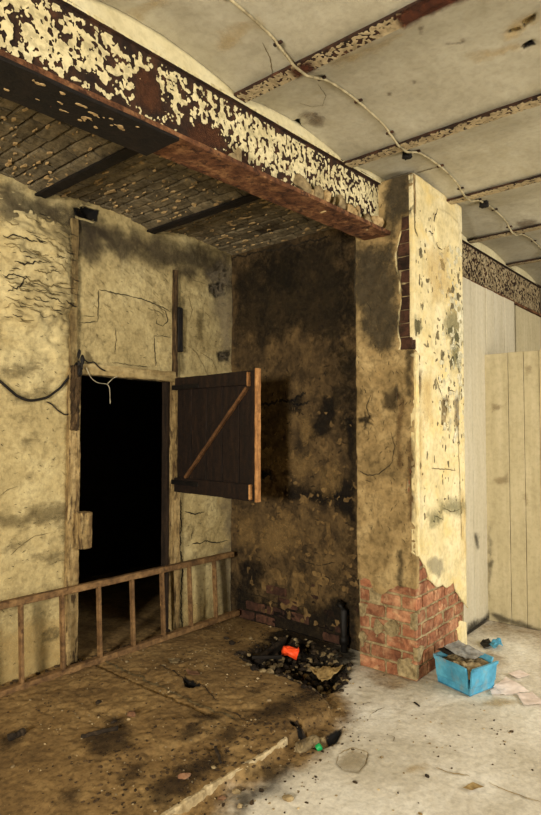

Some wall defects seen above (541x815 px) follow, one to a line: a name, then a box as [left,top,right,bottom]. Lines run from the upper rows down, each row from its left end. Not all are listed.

rust [396,0,464,29]
rust [291,63,315,79]
rust [190,126,220,144]
leakage [235,239,371,546]
peeling [388,210,541,484]
flaking render [236,419,468,682]
leakage [231,556,358,651]